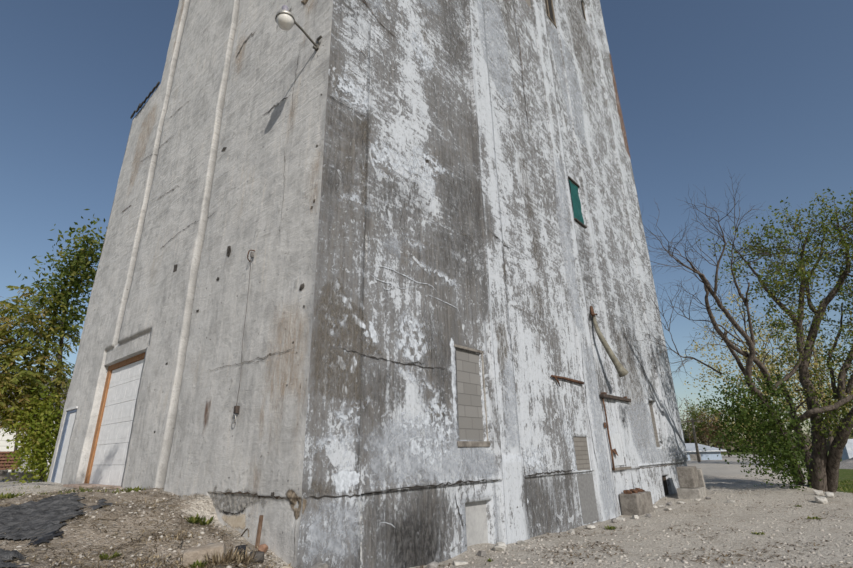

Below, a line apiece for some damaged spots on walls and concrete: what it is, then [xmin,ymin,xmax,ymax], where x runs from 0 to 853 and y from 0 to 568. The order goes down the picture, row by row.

peeling [333,76,453,204]
crack [212,347,302,371]
crack [332,347,445,369]
peeling [497,325,509,368]
peeling [210,487,274,529]
crack [216,491,283,515]
peeling [286,462,360,519]
crack [306,479,500,528]
crack [526,468,575,476]
leakage [391,512,439,567]